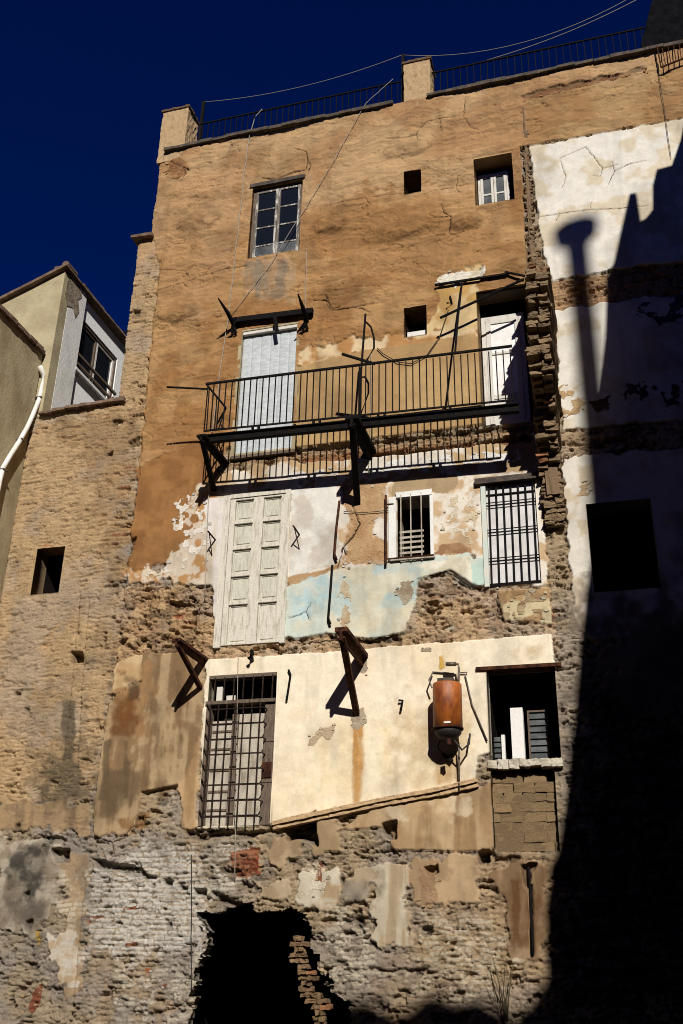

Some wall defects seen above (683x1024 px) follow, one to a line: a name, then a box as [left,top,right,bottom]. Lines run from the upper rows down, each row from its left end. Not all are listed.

crack [547,147,646,220]
flaking render [435,266,486,289]
flaking render [558,380,683,419]
spalling [119,493,215,653]
crack [338,511,361,566]
peeling [286,450,522,628]
spalling [394,572,549,652]
damp [40,701,86,799]
damp [99,740,140,814]
flaking render [308,723,336,745]
rust [353,726,363,802]
damp [6,836,53,918]